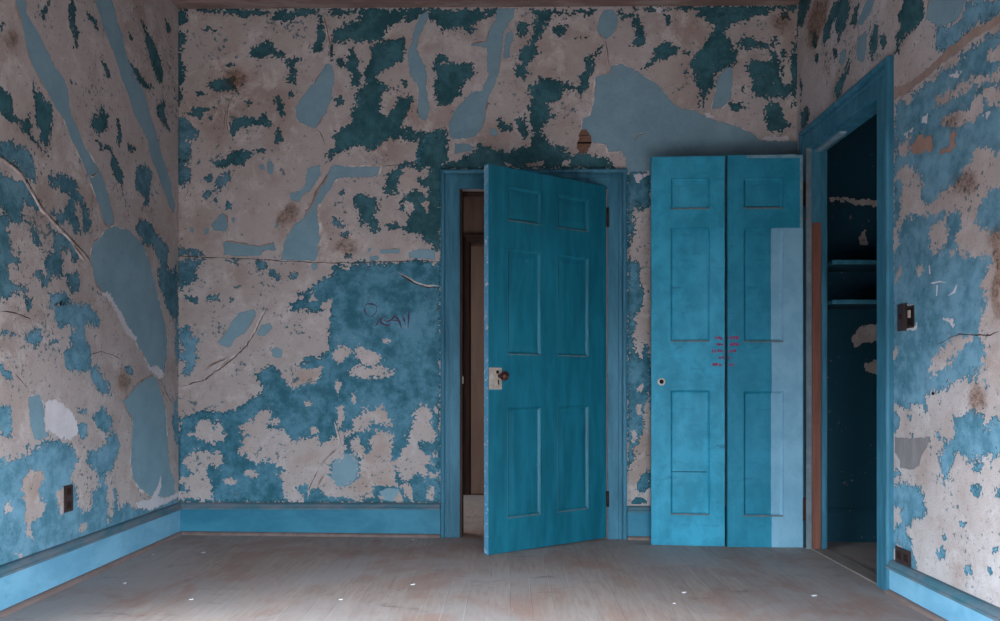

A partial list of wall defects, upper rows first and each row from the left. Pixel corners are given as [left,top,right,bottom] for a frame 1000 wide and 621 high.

crack [0,155,92,265]
peeling [812,0,1000,435]
crack [181,256,439,288]
peeling [0,0,812,565]
crack [162,309,266,401]
crack [939,331,999,344]
peeling [936,404,1000,499]
peeling [894,468,927,569]
peeling [936,533,947,561]